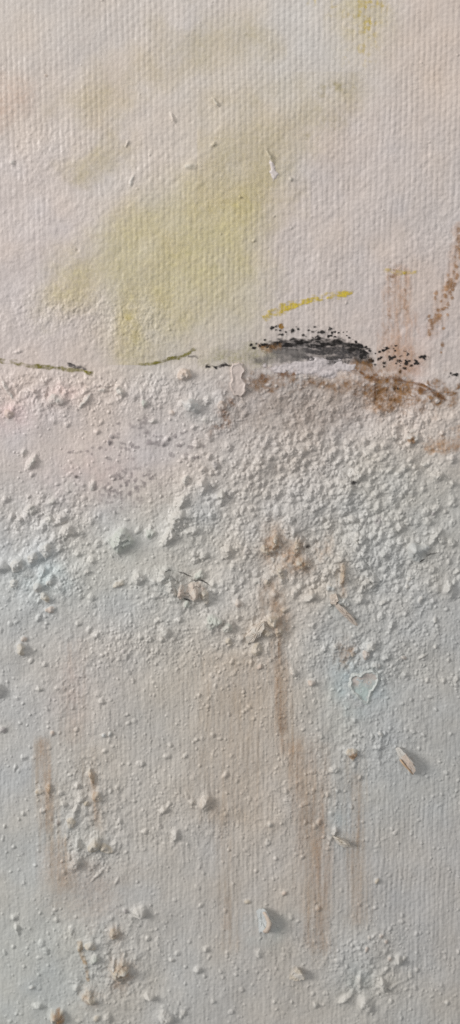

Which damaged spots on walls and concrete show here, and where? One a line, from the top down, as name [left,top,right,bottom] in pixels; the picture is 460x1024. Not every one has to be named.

corrosion [428,231,460,336]
damp [261,337,370,359]
peeling [229,362,247,397]
corrosion [354,361,460,411]